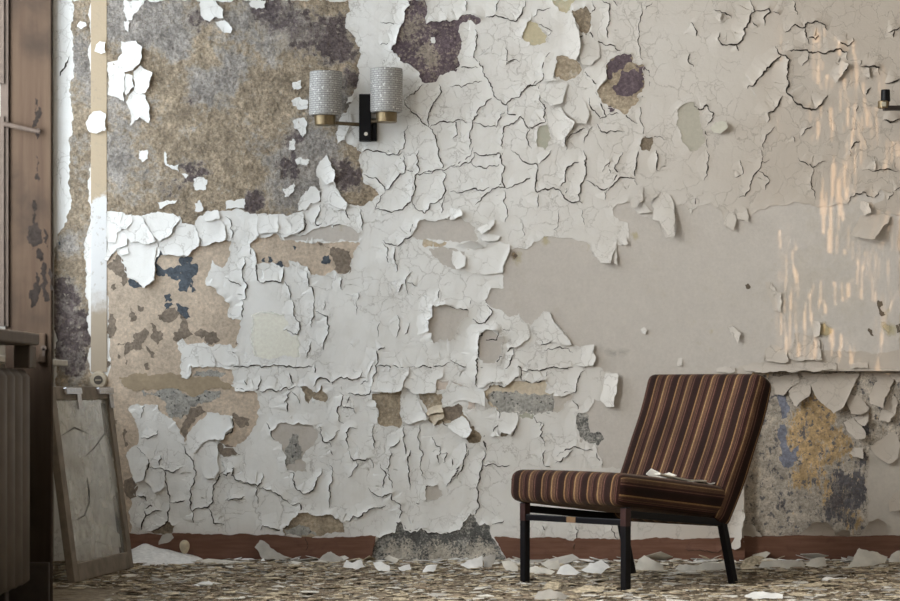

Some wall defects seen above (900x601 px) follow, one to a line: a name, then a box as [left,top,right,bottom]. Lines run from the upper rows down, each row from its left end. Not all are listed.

peeling [382,0,490,94]
peeling [512,0,653,154]
crack [291,0,900,272]
peeling [631,95,713,160]
peeling [27,0,381,545]
crack [133,215,620,551]
peeling [364,181,900,550]